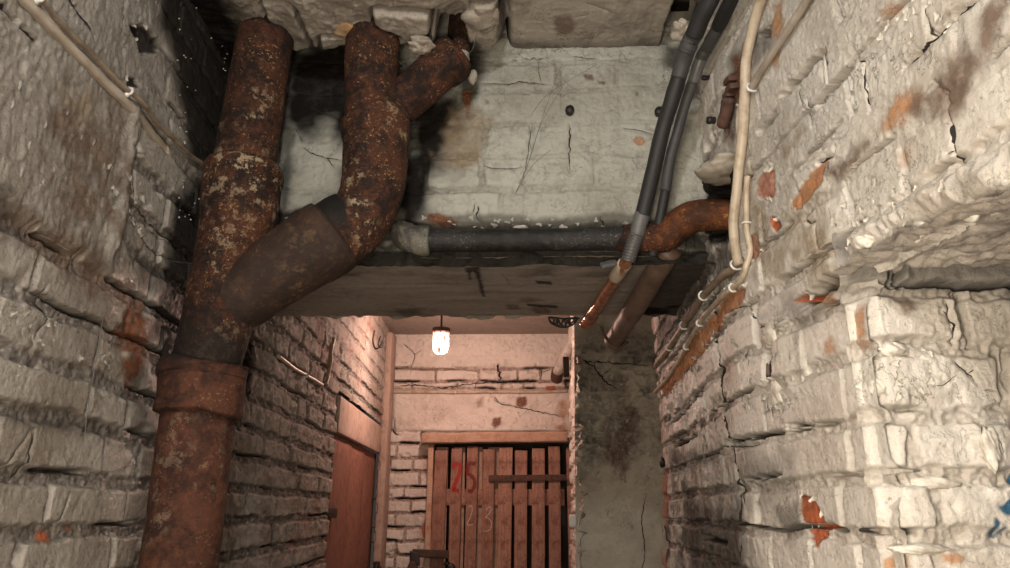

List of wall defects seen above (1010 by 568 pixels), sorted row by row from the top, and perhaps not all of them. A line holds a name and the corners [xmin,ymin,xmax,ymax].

crack [488,57,550,85]
crack [486,119,533,193]
spalling [757,166,781,232]
spalling [789,160,829,215]
flaking render [662,280,748,405]
crack [396,344,558,416]
crack [639,497,647,568]
spalling [800,491,845,547]